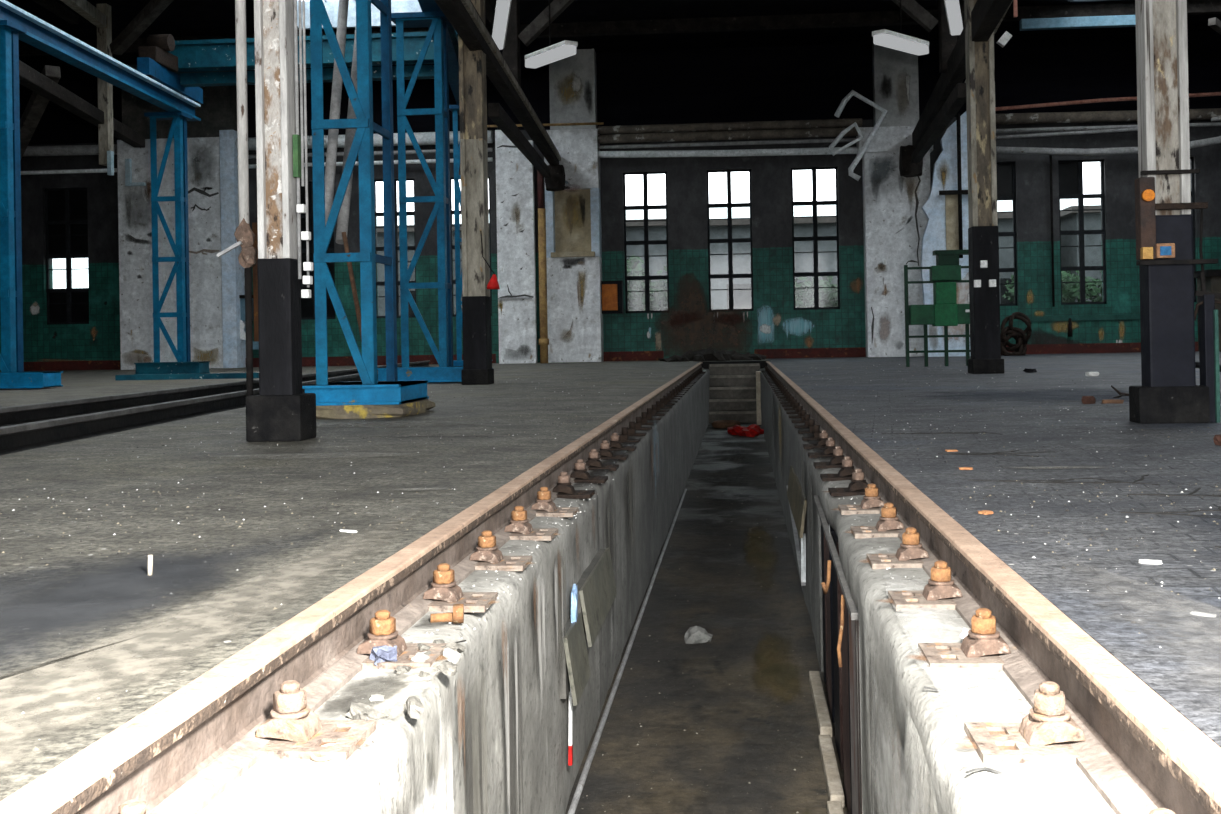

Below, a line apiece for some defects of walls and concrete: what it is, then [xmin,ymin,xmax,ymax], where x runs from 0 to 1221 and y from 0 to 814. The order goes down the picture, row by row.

crack [188,187,219,211]
crack [906,176,921,266]
peeling [758,308,812,341]